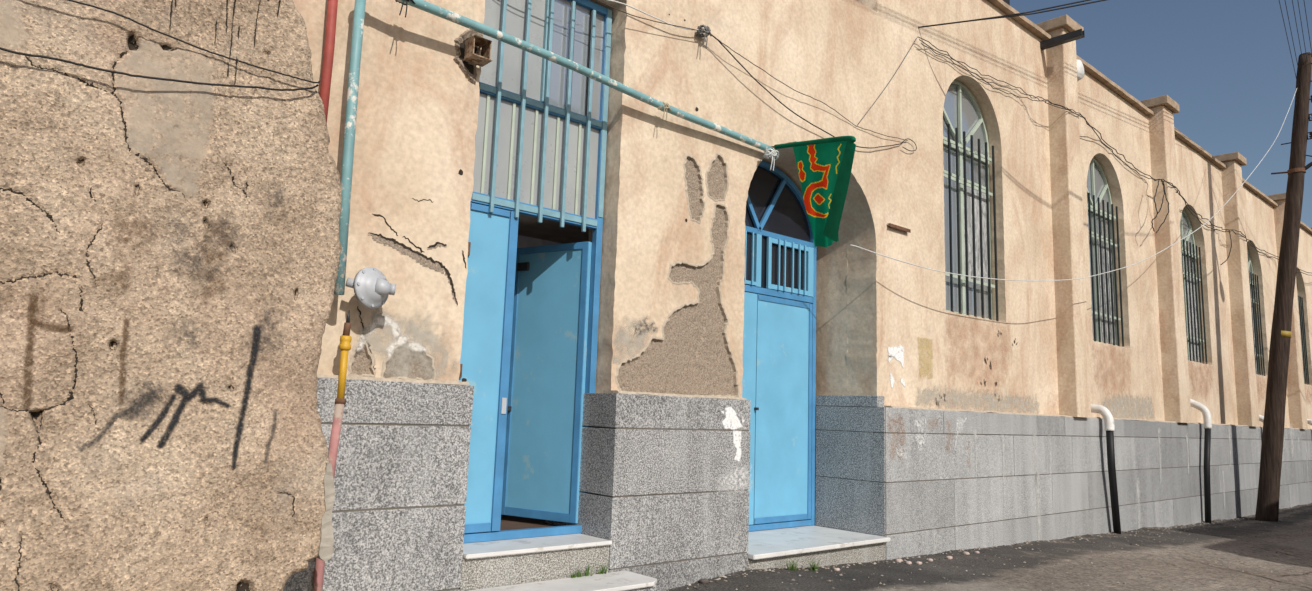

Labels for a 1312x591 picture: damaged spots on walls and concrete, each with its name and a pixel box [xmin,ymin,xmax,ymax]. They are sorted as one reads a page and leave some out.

crack [0,187,102,519]
crack [368,214,466,306]
peeling [614,152,740,397]
crack [1,537,22,591]